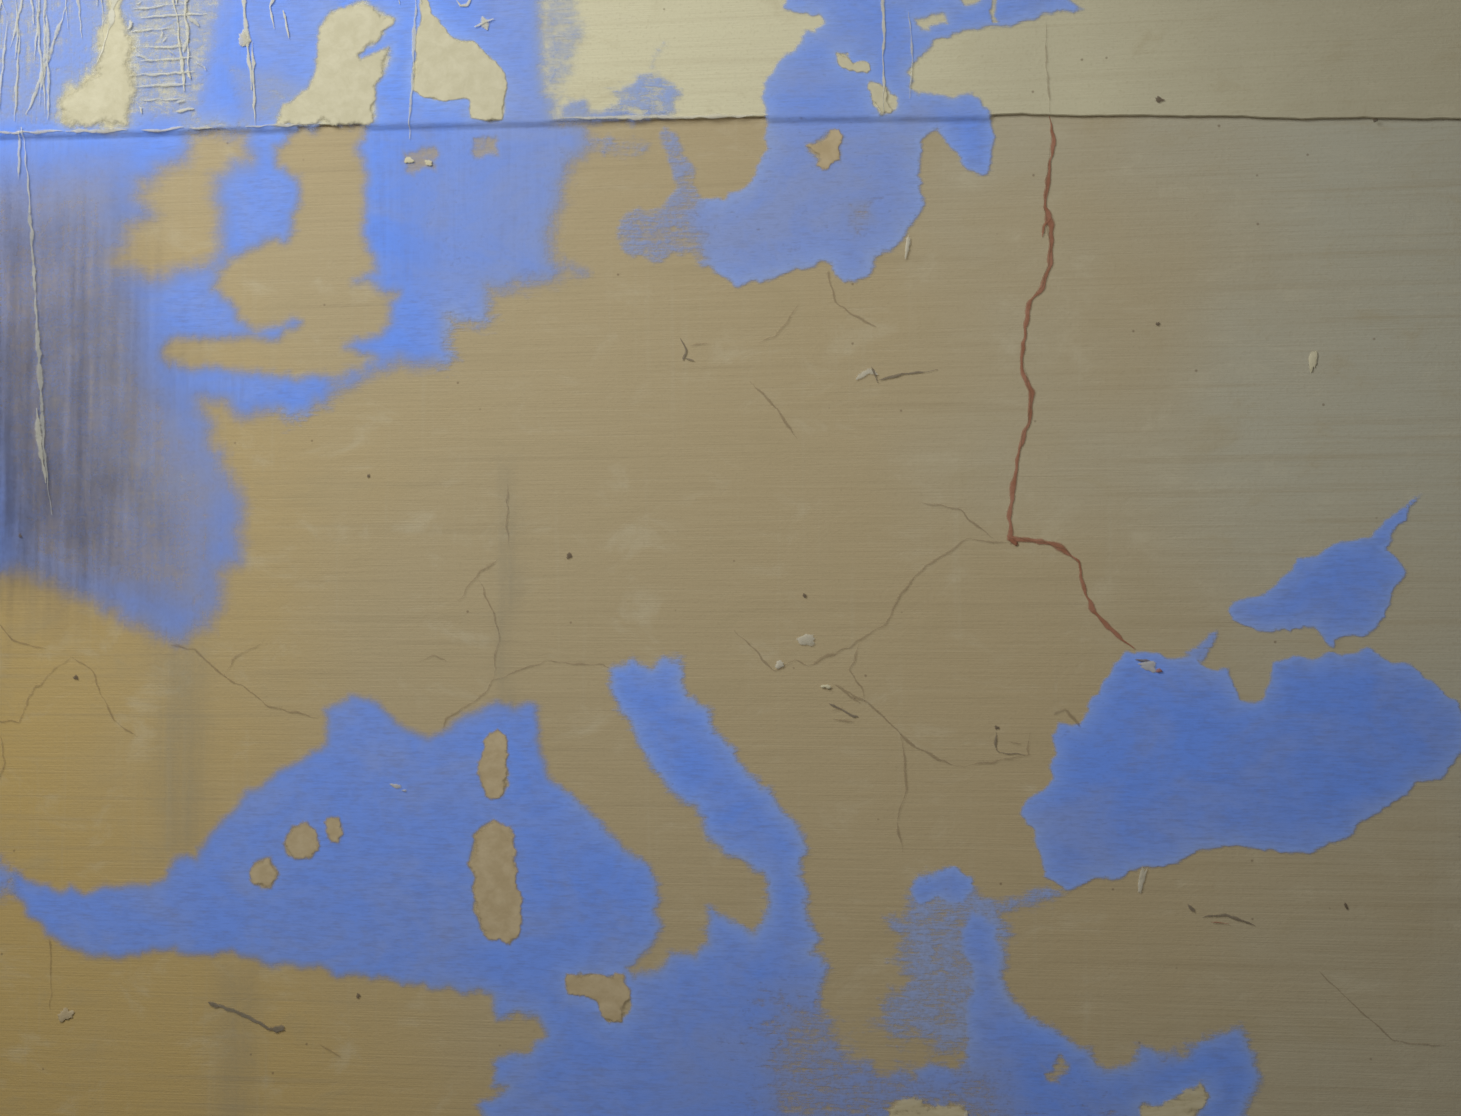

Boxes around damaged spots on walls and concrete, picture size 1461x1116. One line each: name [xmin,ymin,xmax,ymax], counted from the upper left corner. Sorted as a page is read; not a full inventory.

water stain [17,127,52,514]
peeling [0,0,1078,638]
crack [1007,116,1134,648]